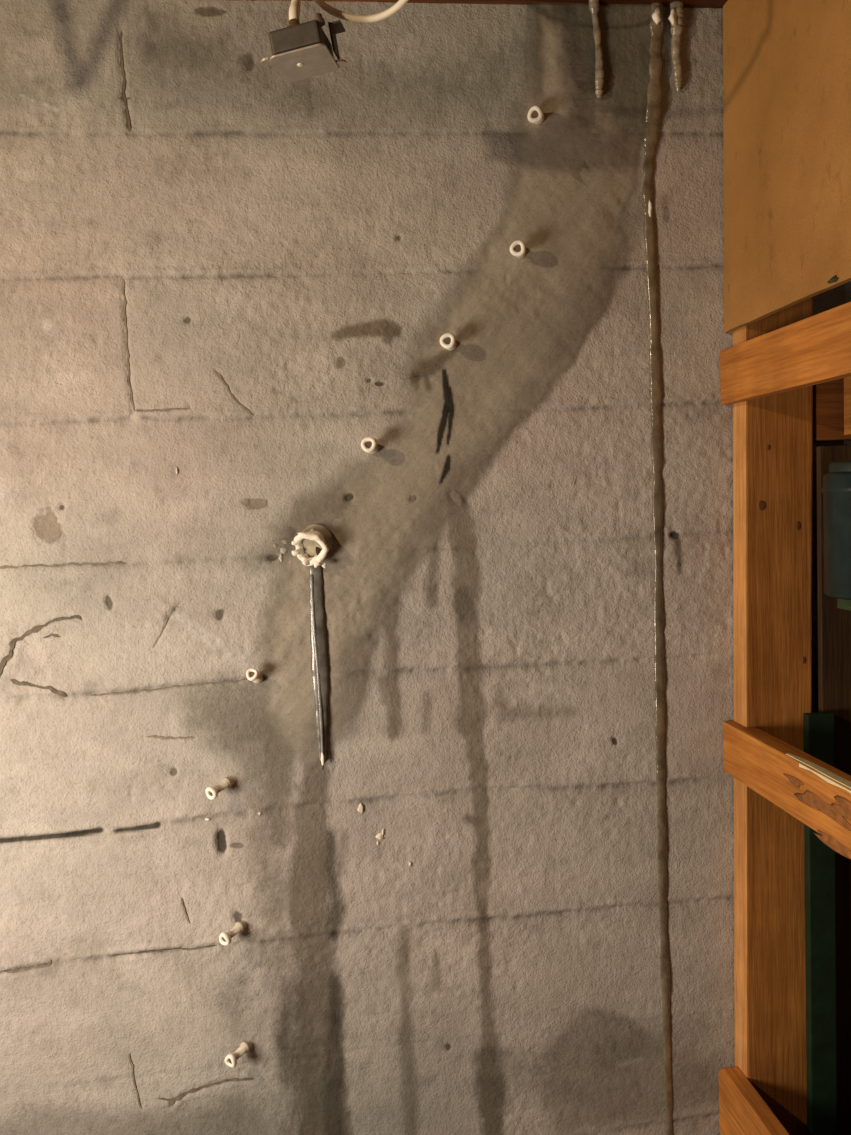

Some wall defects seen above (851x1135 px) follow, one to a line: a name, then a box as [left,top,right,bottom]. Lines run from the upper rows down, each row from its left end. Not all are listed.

damp [334,320,400,343]
damp [407,350,453,389]
crack [0,615,248,697]
damp [385,601,400,738]
damp [449,500,502,1135]
damp [398,932,414,1135]
crack [128,1054,253,1109]